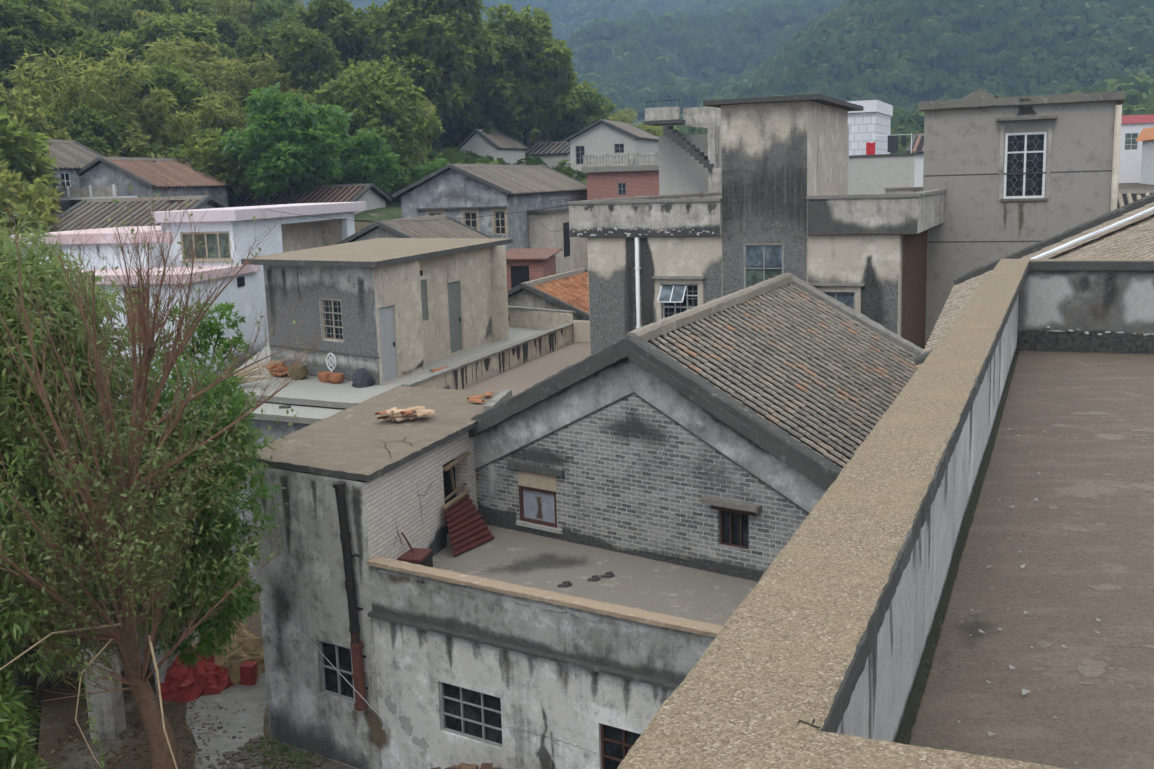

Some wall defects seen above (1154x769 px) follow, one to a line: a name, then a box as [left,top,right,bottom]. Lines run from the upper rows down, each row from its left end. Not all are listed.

water stain [570,127,918,354]
water stain [219,269,380,385]
water stain [604,412,665,442]
water stain [280,476,291,546]
water stain [352,488,363,573]
water stain [274,587,290,632]
water stain [372,603,686,710]
water stain [271,712,368,769]
water stain [538,711,555,769]